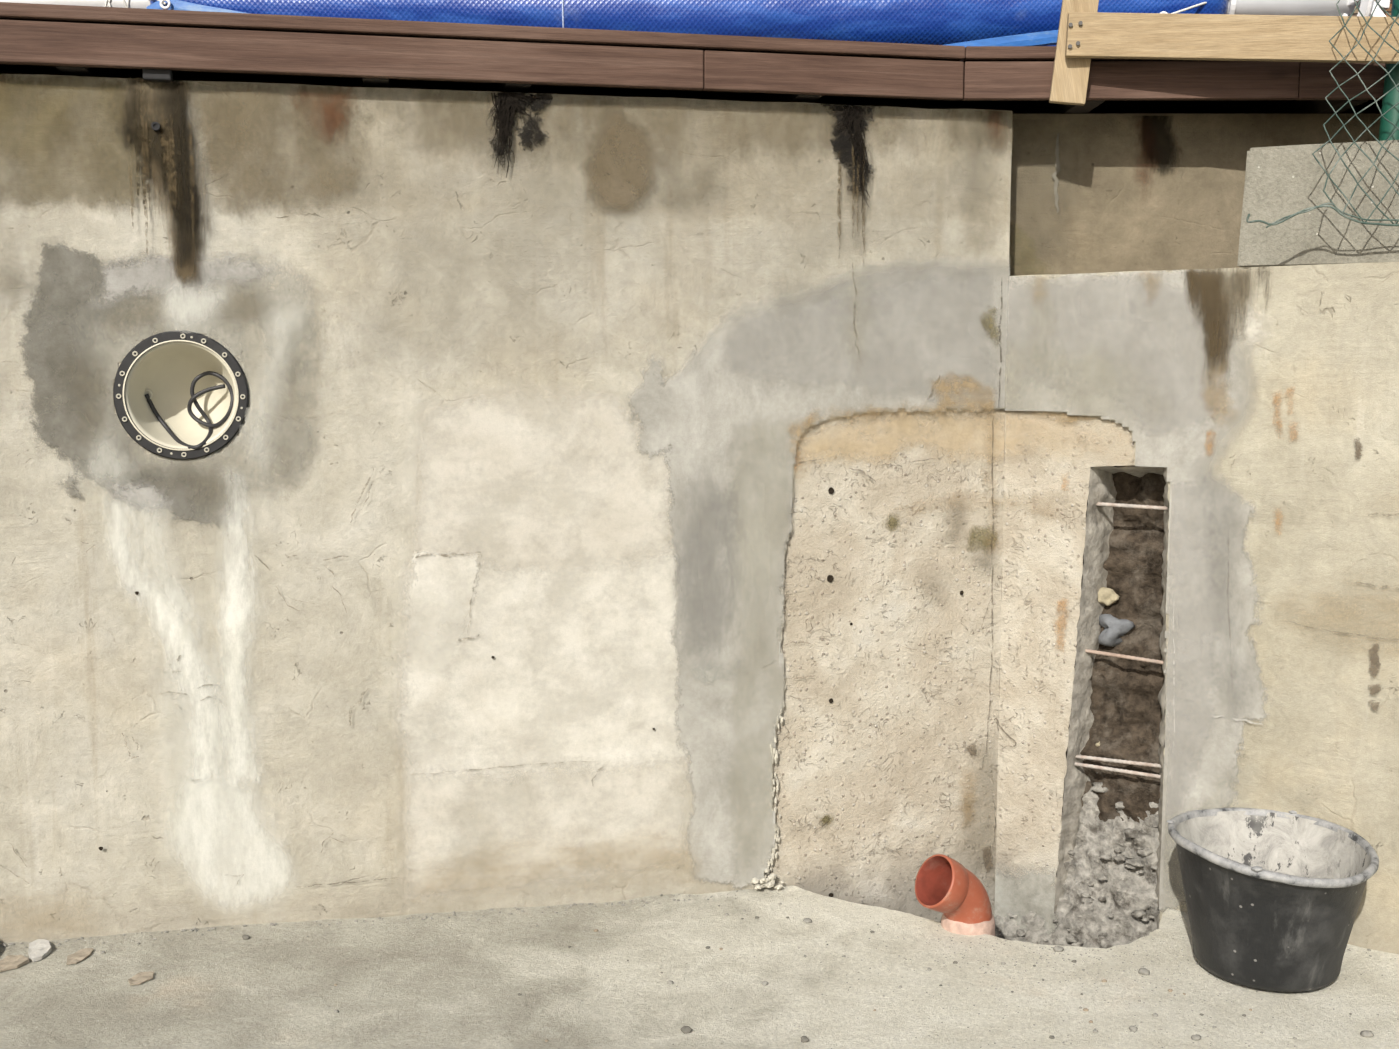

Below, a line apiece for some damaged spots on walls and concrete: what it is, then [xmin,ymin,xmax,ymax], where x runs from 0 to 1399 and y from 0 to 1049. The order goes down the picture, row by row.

water stain [0,76,71,183]
water stain [87,78,355,283]
water stain [464,92,553,178]
water stain [821,104,880,262]
water stain [1187,267,1260,378]
water stain [18,243,288,901]
spalling [764,409,1169,931]